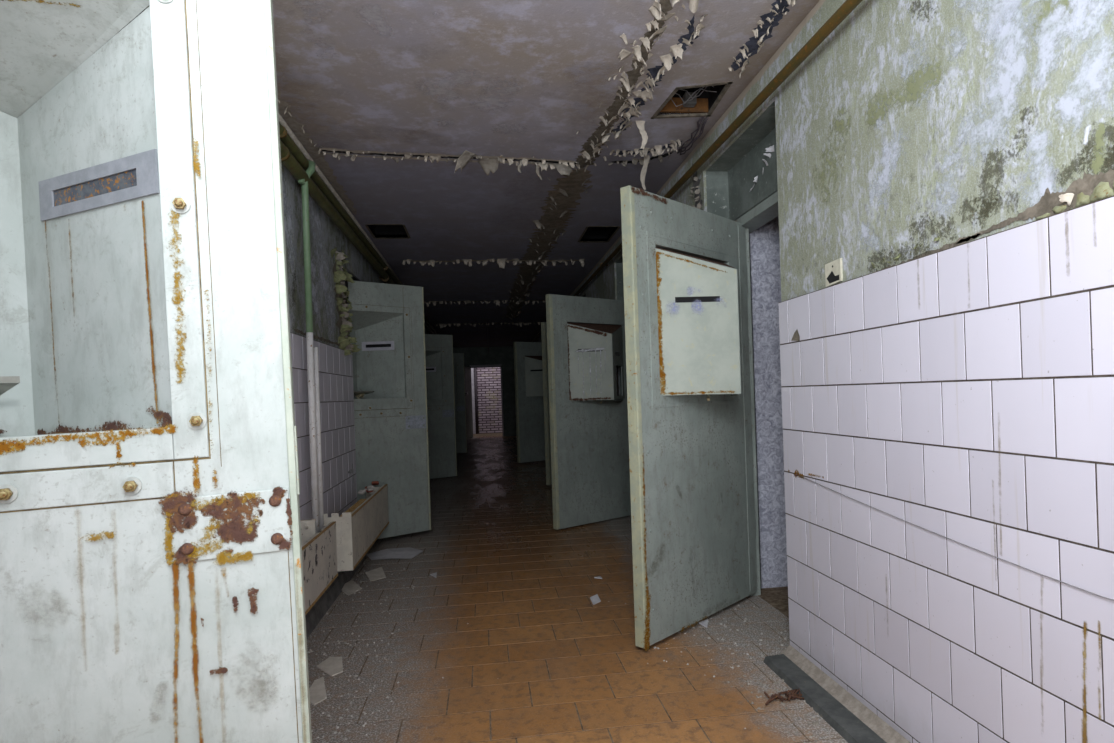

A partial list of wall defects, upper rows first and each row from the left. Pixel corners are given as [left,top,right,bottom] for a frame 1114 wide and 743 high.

rust [0,200,176,468]
rust [169,211,187,383]
leakage [282,175,336,333]
peeling [277,0,708,328]
peeling [749,145,774,192]
peeling [728,0,796,79]
leakage [908,0,936,22]
leakage [867,107,1033,272]
flaking render [860,131,1114,271]
peeling [936,0,1114,211]
leakage [1057,121,1114,185]
rust [159,456,293,743]